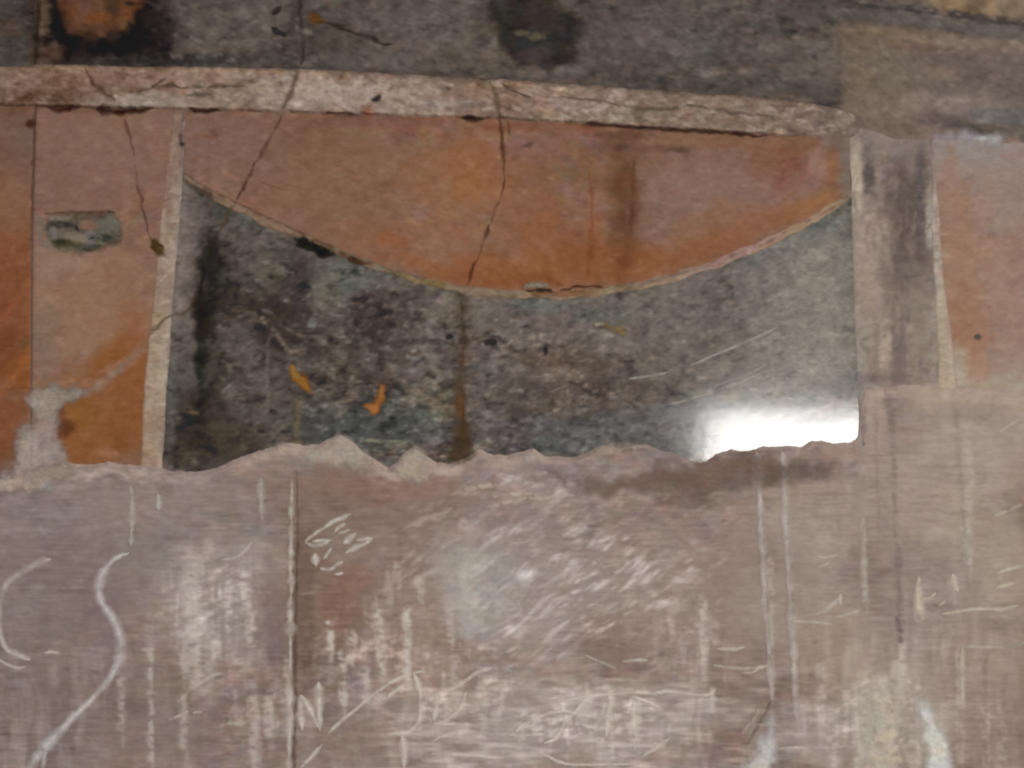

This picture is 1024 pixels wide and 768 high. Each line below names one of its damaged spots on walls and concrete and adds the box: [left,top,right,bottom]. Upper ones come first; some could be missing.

crack [85,68,164,256]
crack [223,0,391,225]
crack [498,84,527,188]
crack [467,225,489,285]
corrosion [452,303,469,458]